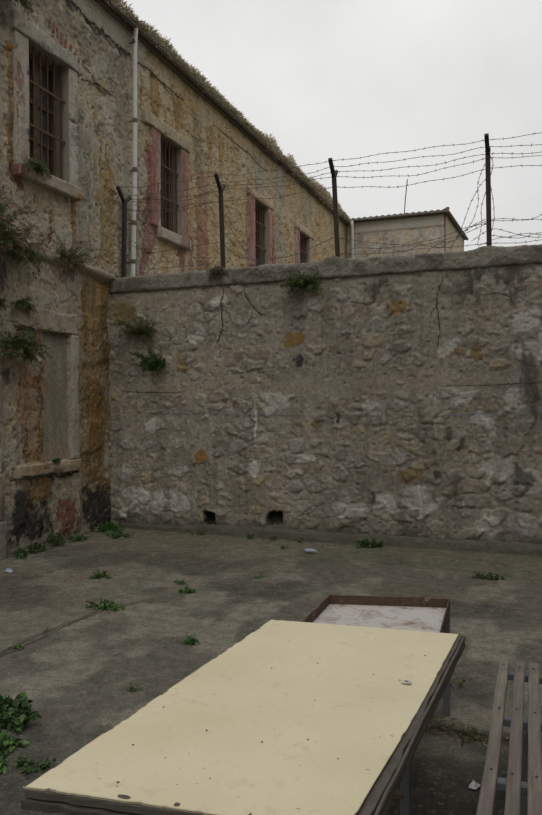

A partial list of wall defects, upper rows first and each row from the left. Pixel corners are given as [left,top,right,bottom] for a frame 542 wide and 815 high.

crack [430,276,443,347]
water stain [522,343,539,419]